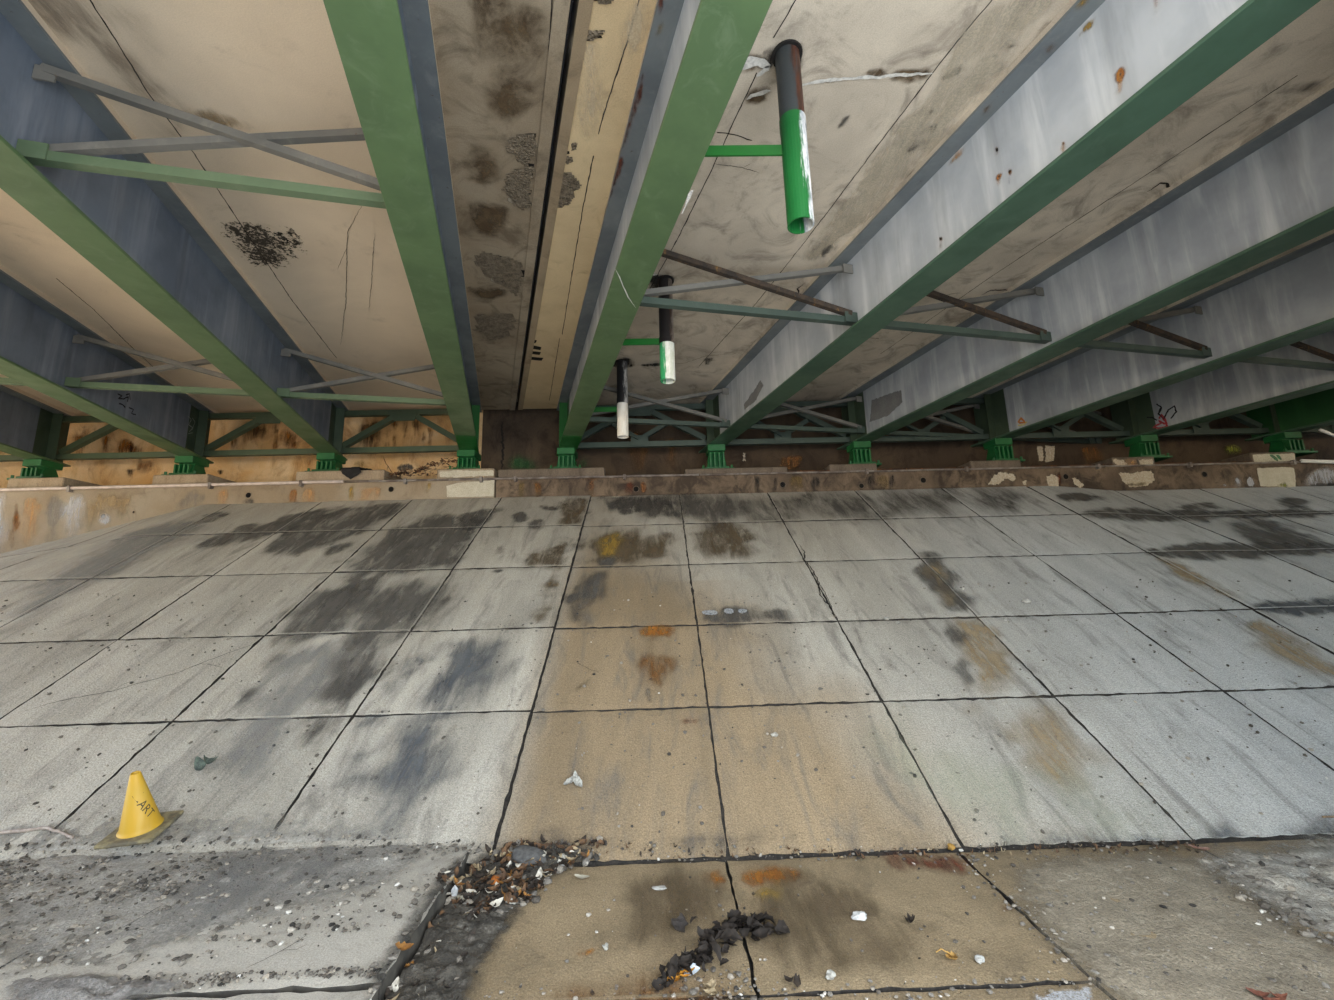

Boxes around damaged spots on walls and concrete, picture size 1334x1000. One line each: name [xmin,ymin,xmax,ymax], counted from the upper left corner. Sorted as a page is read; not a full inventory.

spalling [501,133,538,210]
crack [338,206,375,344]
spalling [474,251,525,296]
spalling [473,314,517,340]
peeling [1037,445,1084,488]
peeling [1082,447,1155,487]
water stain [19,475,956,768]
corrosion [642,625,672,636]
water stain [916,552,1008,682]
water stain [360,641,499,807]